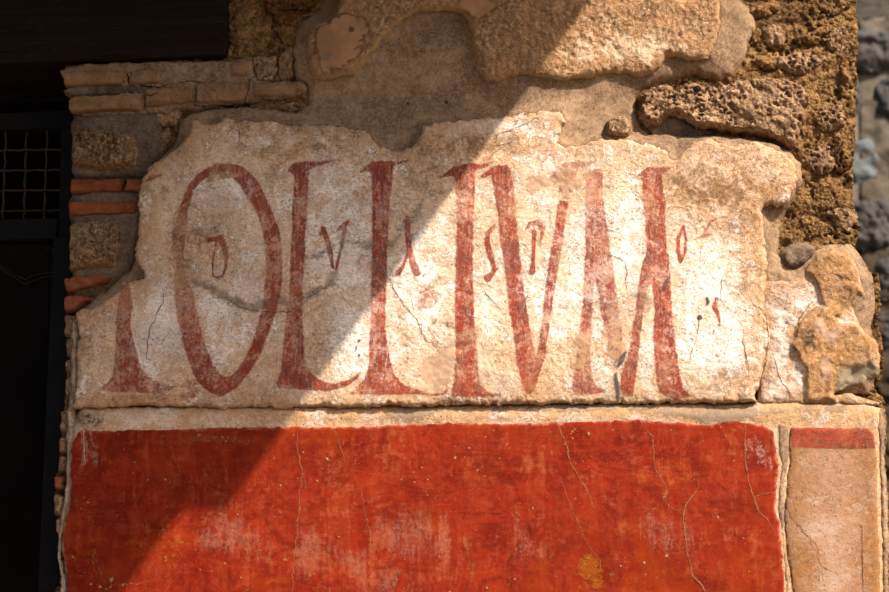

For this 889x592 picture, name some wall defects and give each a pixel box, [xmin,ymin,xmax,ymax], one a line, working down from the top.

crack [146,289,171,357]
spalling [834,361,880,391]
crack [292,430,305,589]
crack [558,426,603,577]
crack [640,421,706,592]